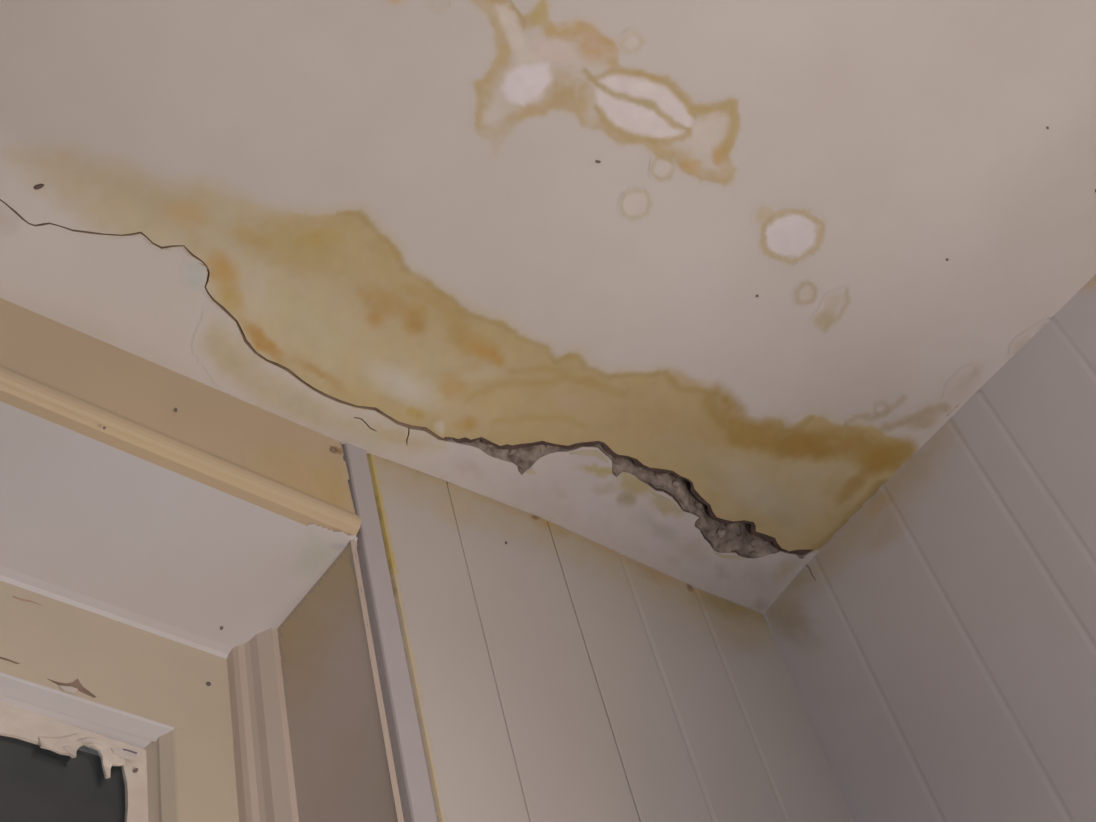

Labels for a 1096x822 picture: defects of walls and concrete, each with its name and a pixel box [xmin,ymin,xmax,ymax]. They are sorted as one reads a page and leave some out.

damp [424,0,745,224]
crack [0,199,447,443]
damp [0,132,987,822]
spalling [444,437,813,560]
peeling [38,734,137,779]